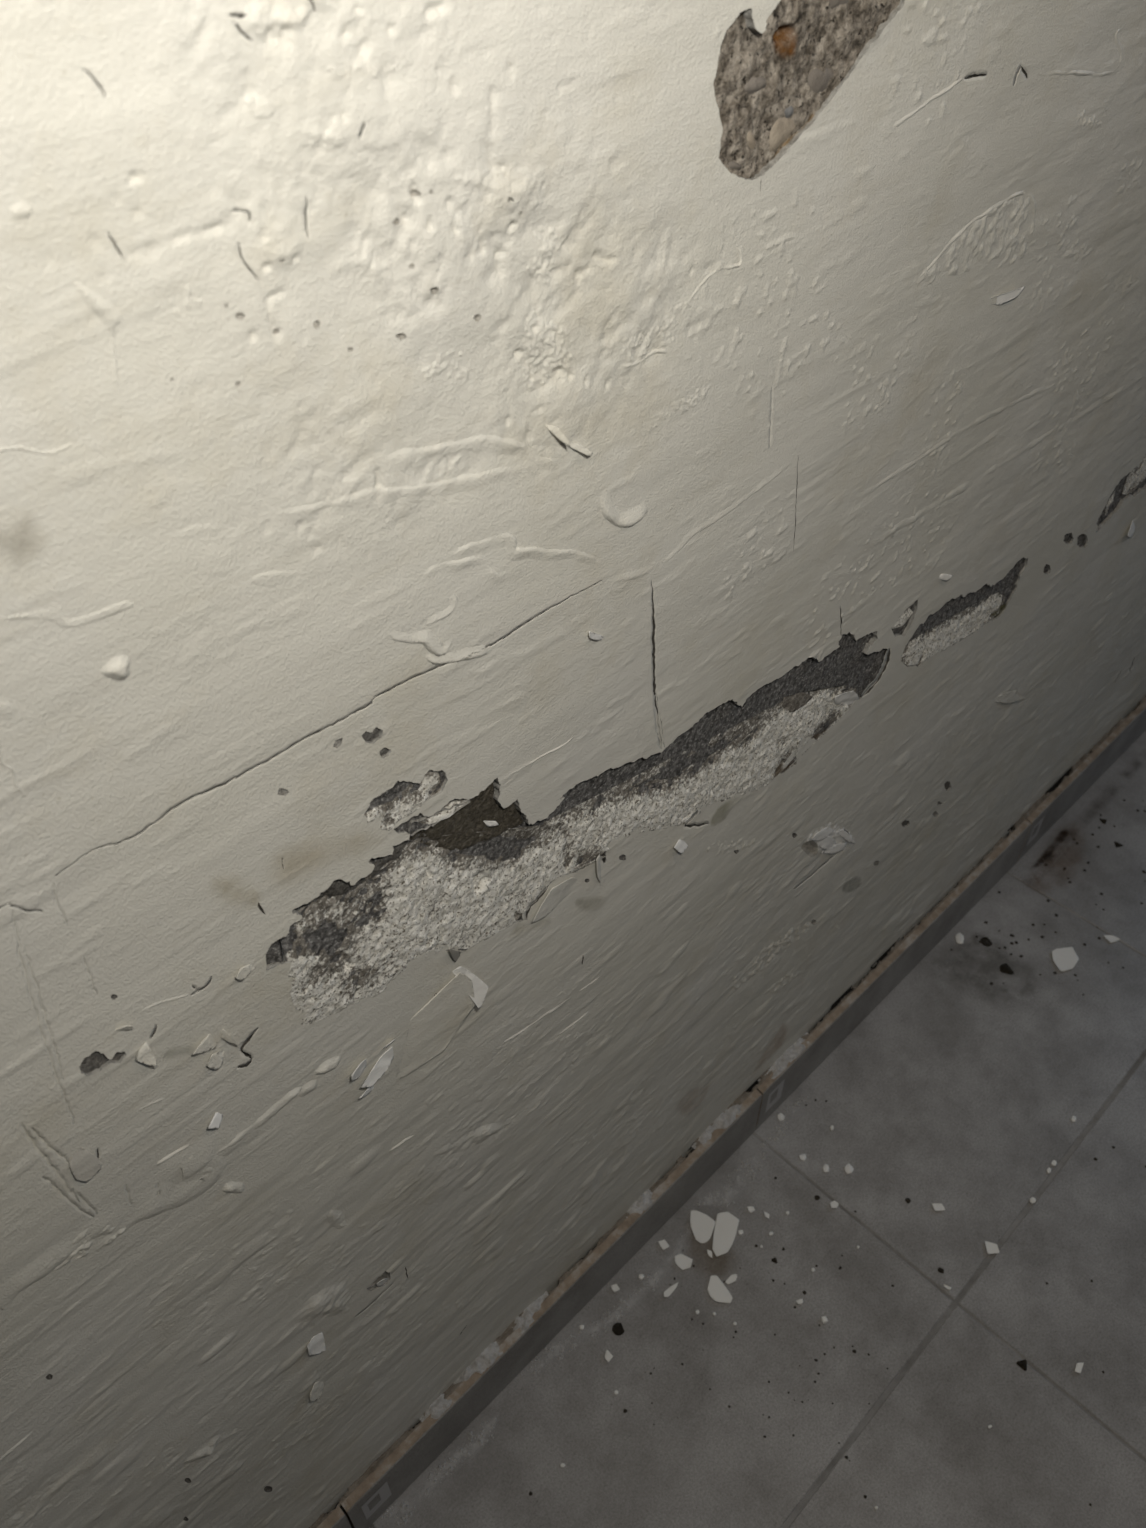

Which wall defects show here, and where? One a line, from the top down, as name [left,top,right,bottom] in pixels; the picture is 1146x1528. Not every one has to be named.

flaking render [713,0,905,180]
flaking render [1064,454,1146,548]
crack [0,579,603,914]
crack [522,885,549,921]
flaking render [235,557,1051,1099]
crack [650,580,665,749]